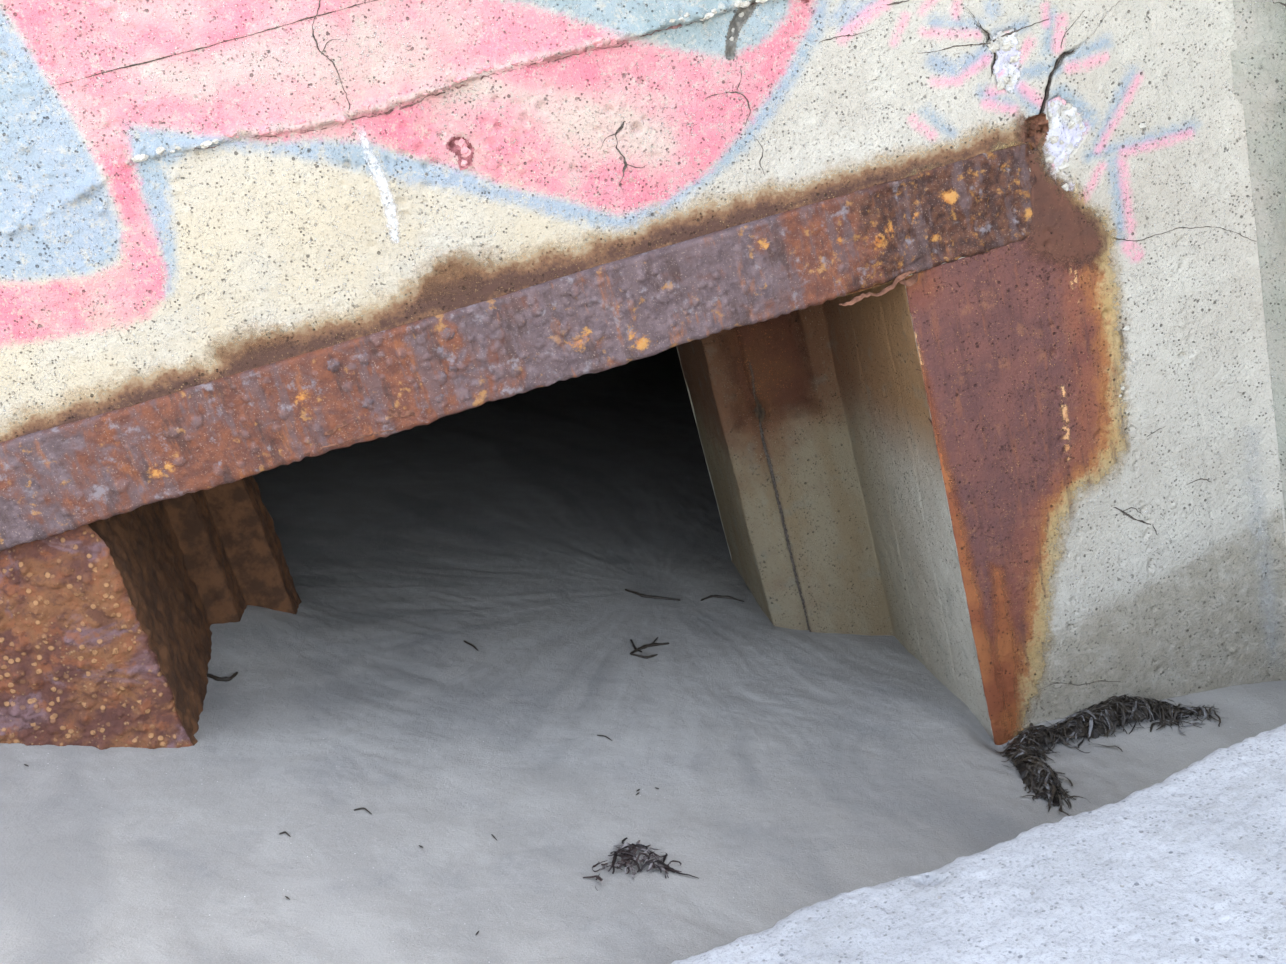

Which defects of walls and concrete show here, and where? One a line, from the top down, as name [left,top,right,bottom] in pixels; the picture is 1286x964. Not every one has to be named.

crack [59,0,769,175]
spalling [985,28,1021,94]
crack [918,7,1112,114]
crack [601,121,646,190]
spalling [1025,95,1087,191]
crack [1111,226,1254,241]
corrosion [0,116,1128,745]